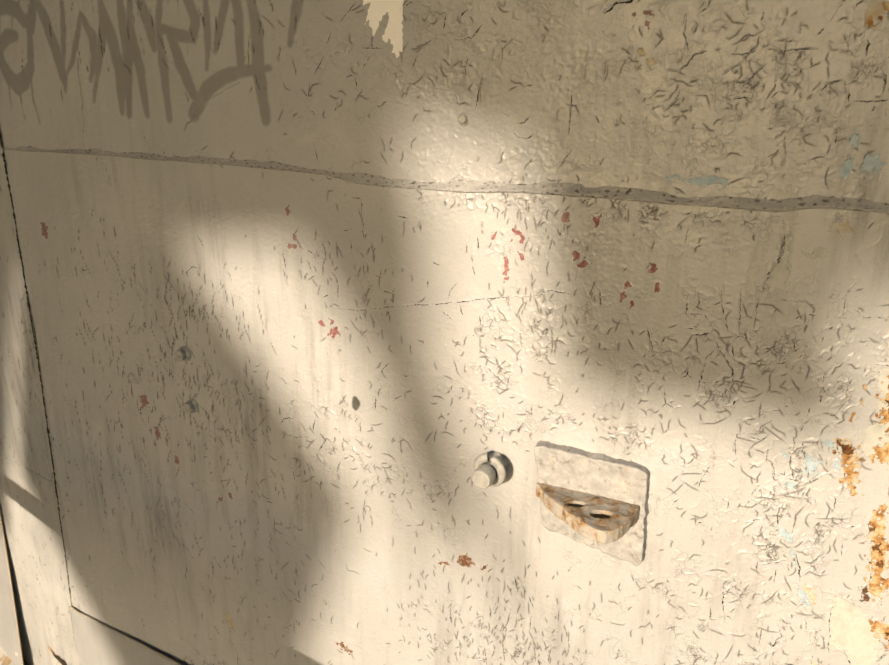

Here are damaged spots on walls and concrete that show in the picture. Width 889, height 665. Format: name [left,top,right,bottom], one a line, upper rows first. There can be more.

crack [323,237,573,325]
peeling [489,228,527,282]
peeling [571,246,592,272]
peeling [775,438,841,491]
corrosion [832,375,889,497]
peeling [858,367,889,468]
corrosion [859,503,889,605]
peeling [825,594,884,665]
corrosion [868,619,889,649]